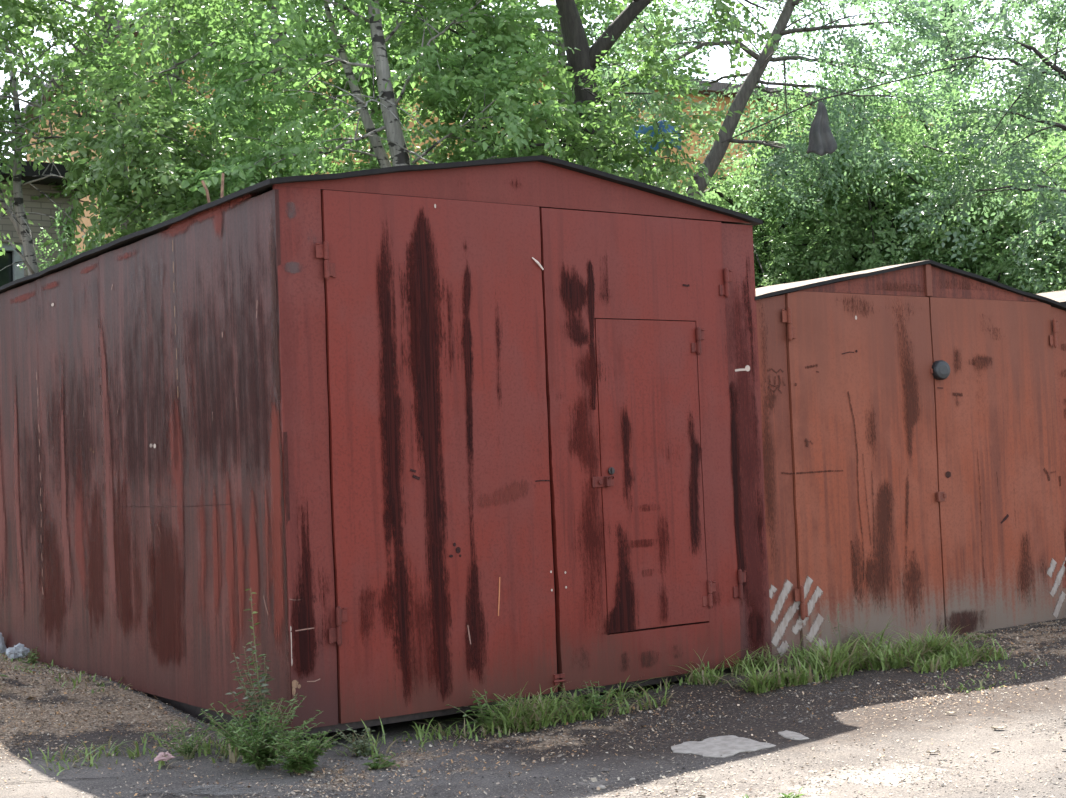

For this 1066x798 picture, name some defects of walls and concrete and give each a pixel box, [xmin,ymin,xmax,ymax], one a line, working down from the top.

rust [20,311,176,642]
rust [269,219,280,397]
rust [361,210,474,700]
rust [465,496,486,680]
rust [561,261,669,634]
rust [689,413,702,553]
rust [730,260,784,651]
rust [869,477,922,615]
rust [897,325,919,455]